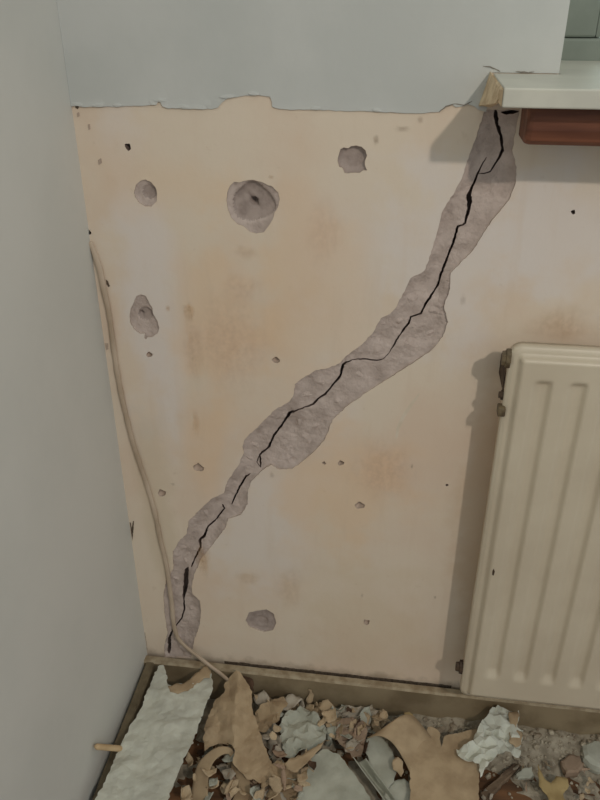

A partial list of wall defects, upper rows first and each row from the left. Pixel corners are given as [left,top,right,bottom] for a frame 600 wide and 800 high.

peeling [56,0,570,658]
crack [167,110,519,654]